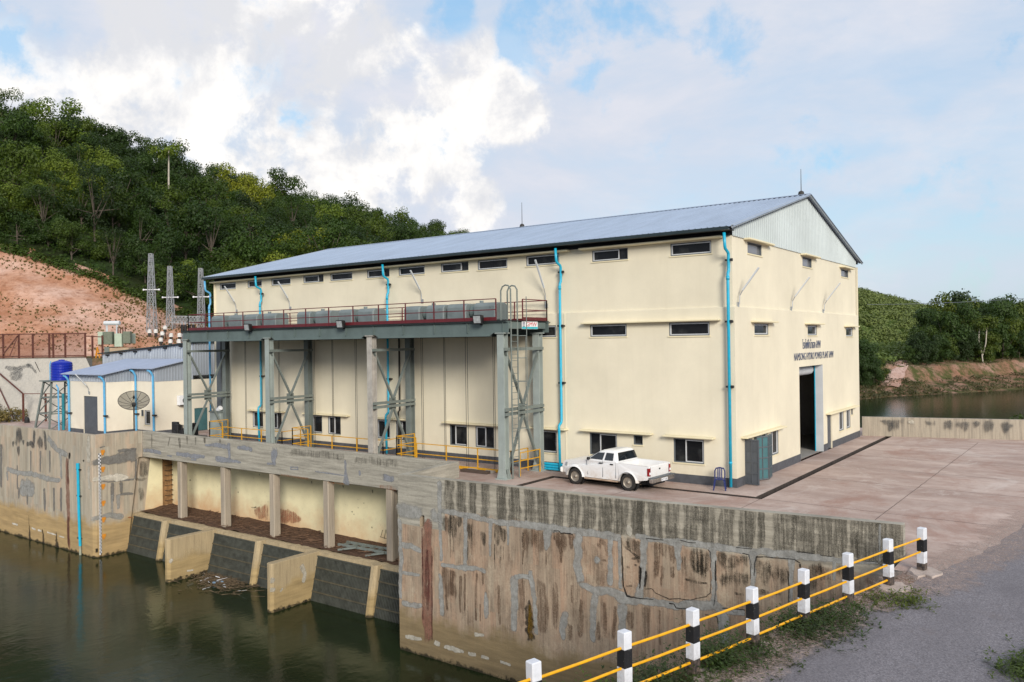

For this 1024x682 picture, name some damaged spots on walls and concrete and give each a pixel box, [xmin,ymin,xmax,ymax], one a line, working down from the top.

corrosion [254,505,301,523]
corrosion [422,519,433,639]
leakage [442,480,904,640]
crack [621,538,831,623]
efflorescence [405,635,511,666]